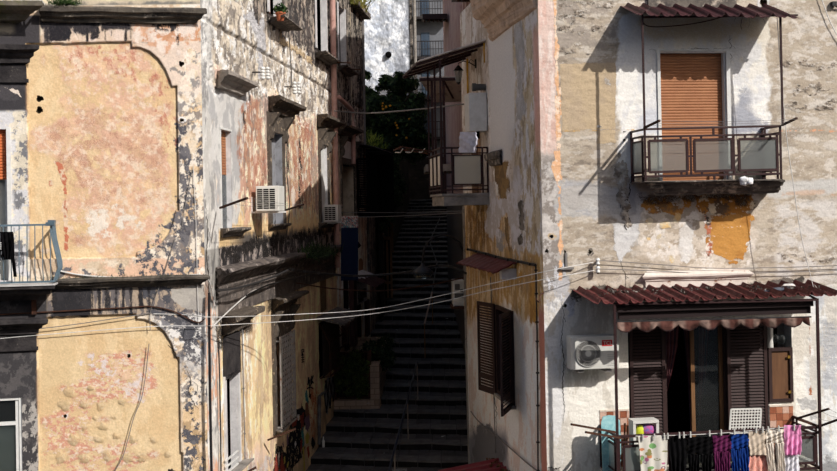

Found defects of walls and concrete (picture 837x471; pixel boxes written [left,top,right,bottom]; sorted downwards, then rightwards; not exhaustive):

peeling [25,24,200,277]
water stain [222,227,329,264]
peeling [613,153,756,264]
water stain [90,287,152,315]
peeling [177,309,206,366]
peeling [38,347,159,471]
peeling [178,381,206,471]